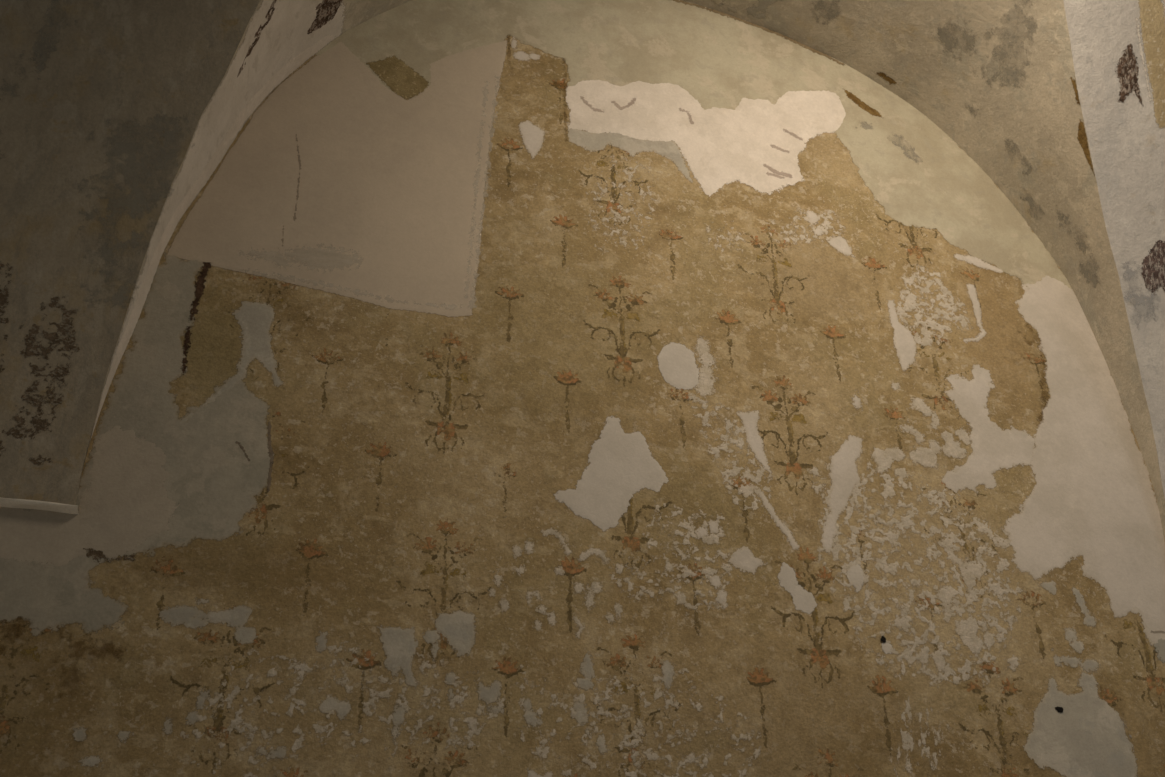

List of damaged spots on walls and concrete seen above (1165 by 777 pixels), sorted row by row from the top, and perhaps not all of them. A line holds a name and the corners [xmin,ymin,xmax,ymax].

leakage [938,0,1035,87]
spalling [0,261,80,456]
peeling [173,301,283,428]
peeling [887,265,973,390]
spalling [83,548,137,562]
peeling [159,598,762,777]
peeling [488,493,768,639]
peeling [777,562,817,614]
peeling [889,696,950,777]
peeling [807,364,1036,687]
peeling [1051,587,1101,690]